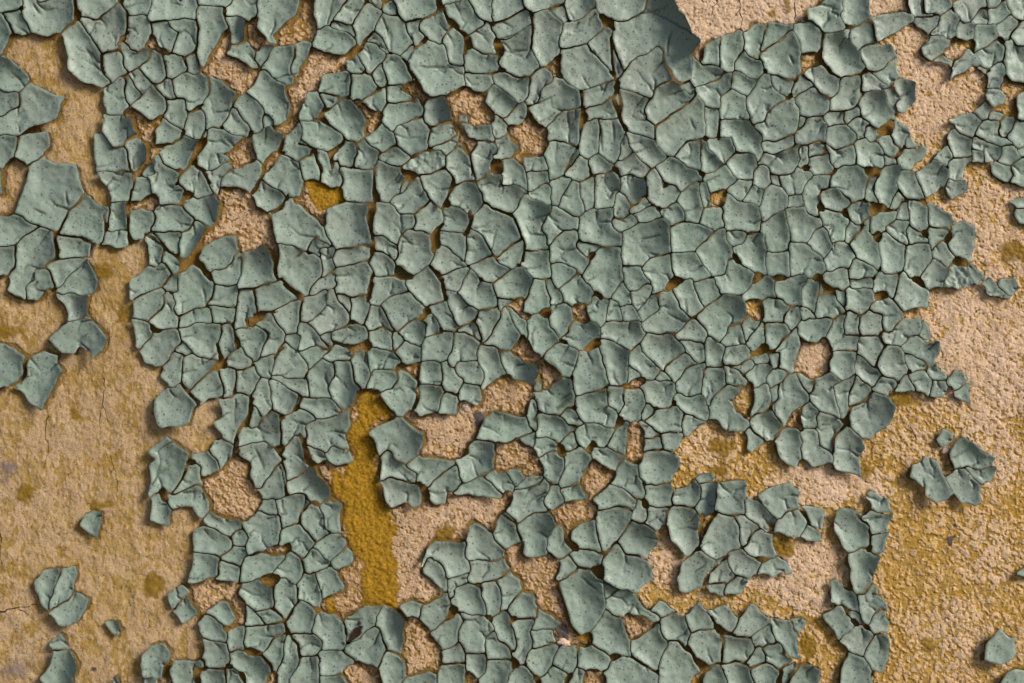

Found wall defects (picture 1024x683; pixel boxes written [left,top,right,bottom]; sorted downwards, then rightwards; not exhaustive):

peeling [394,0,437,21]
peeling [387,83,495,127]
peeling [675,0,818,62]
peeling [873,22,987,172]
peeling [869,0,1024,107]
peeling [934,77,1024,199]
peeling [0,0,348,683]
peeling [405,377,534,459]
peeling [549,161,1024,683]
peeling [167,378,405,683]
peeling [389,492,512,618]
peeling [379,523,567,683]